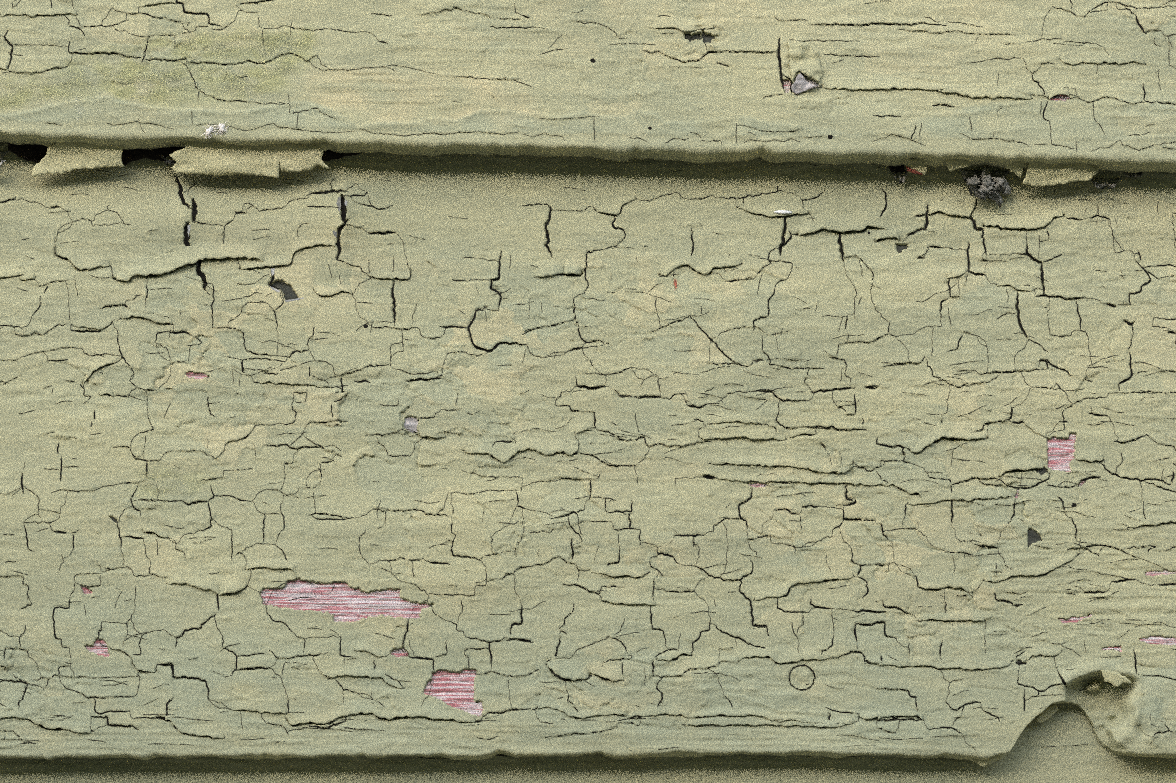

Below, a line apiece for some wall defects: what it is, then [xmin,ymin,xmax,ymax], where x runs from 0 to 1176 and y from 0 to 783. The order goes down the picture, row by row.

crack [0,0,595,141]
crack [429,0,1176,170]
peeling [8,141,360,178]
crack [0,164,1176,757]
spalling [1035,434,1076,475]
spalling [261,579,434,622]
spalling [85,639,109,657]
spalling [424,670,483,717]